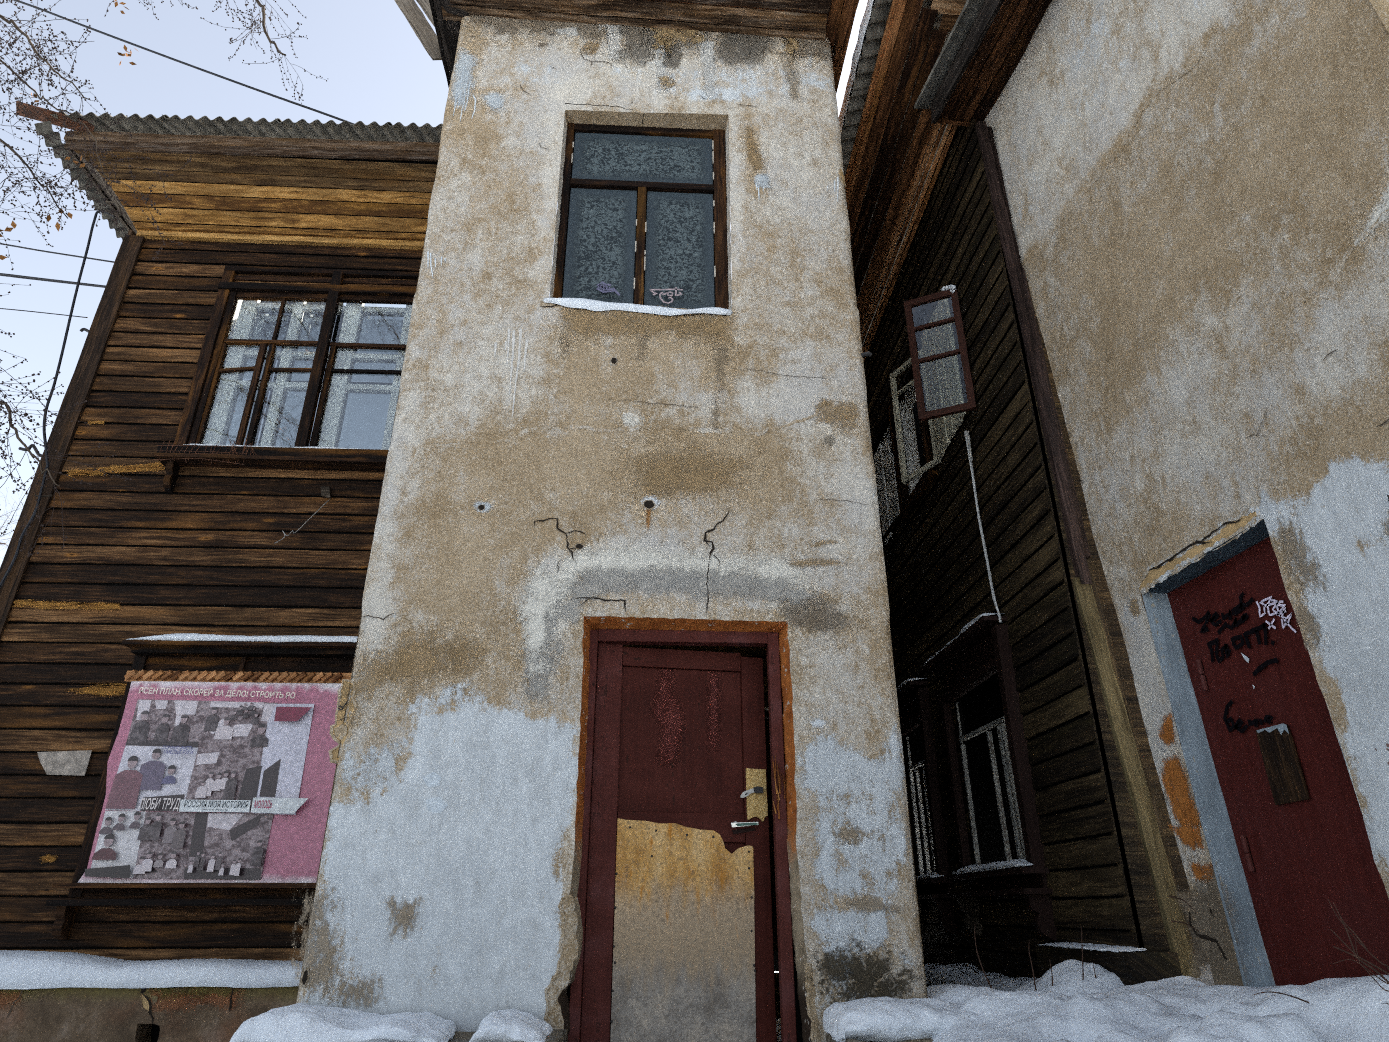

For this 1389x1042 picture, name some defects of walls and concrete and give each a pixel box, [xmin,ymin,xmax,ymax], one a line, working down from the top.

water stain [470,15,681,92]
water stain [698,32,769,98]
crack [534,518,626,612]
water stain [518,539,847,675]
crack [704,510,729,613]
peeling [1129,505,1326,651]
flaking render [329,679,358,764]
peeling [831,827,870,847]
peeling [291,888,386,1007]
peeling [386,896,422,938]
spalling [544,895,579,1030]
peeling [847,896,900,913]